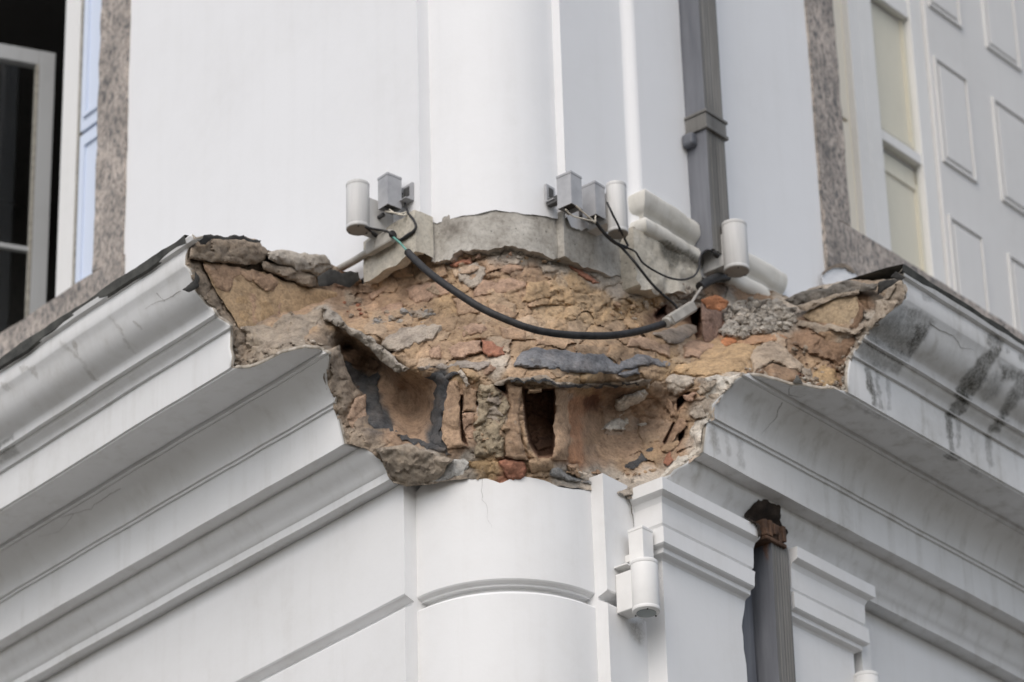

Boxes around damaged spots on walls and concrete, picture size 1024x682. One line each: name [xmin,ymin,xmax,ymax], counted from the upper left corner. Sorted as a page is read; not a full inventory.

spalling [183,210,908,499]
leakage [947,334,1000,438]